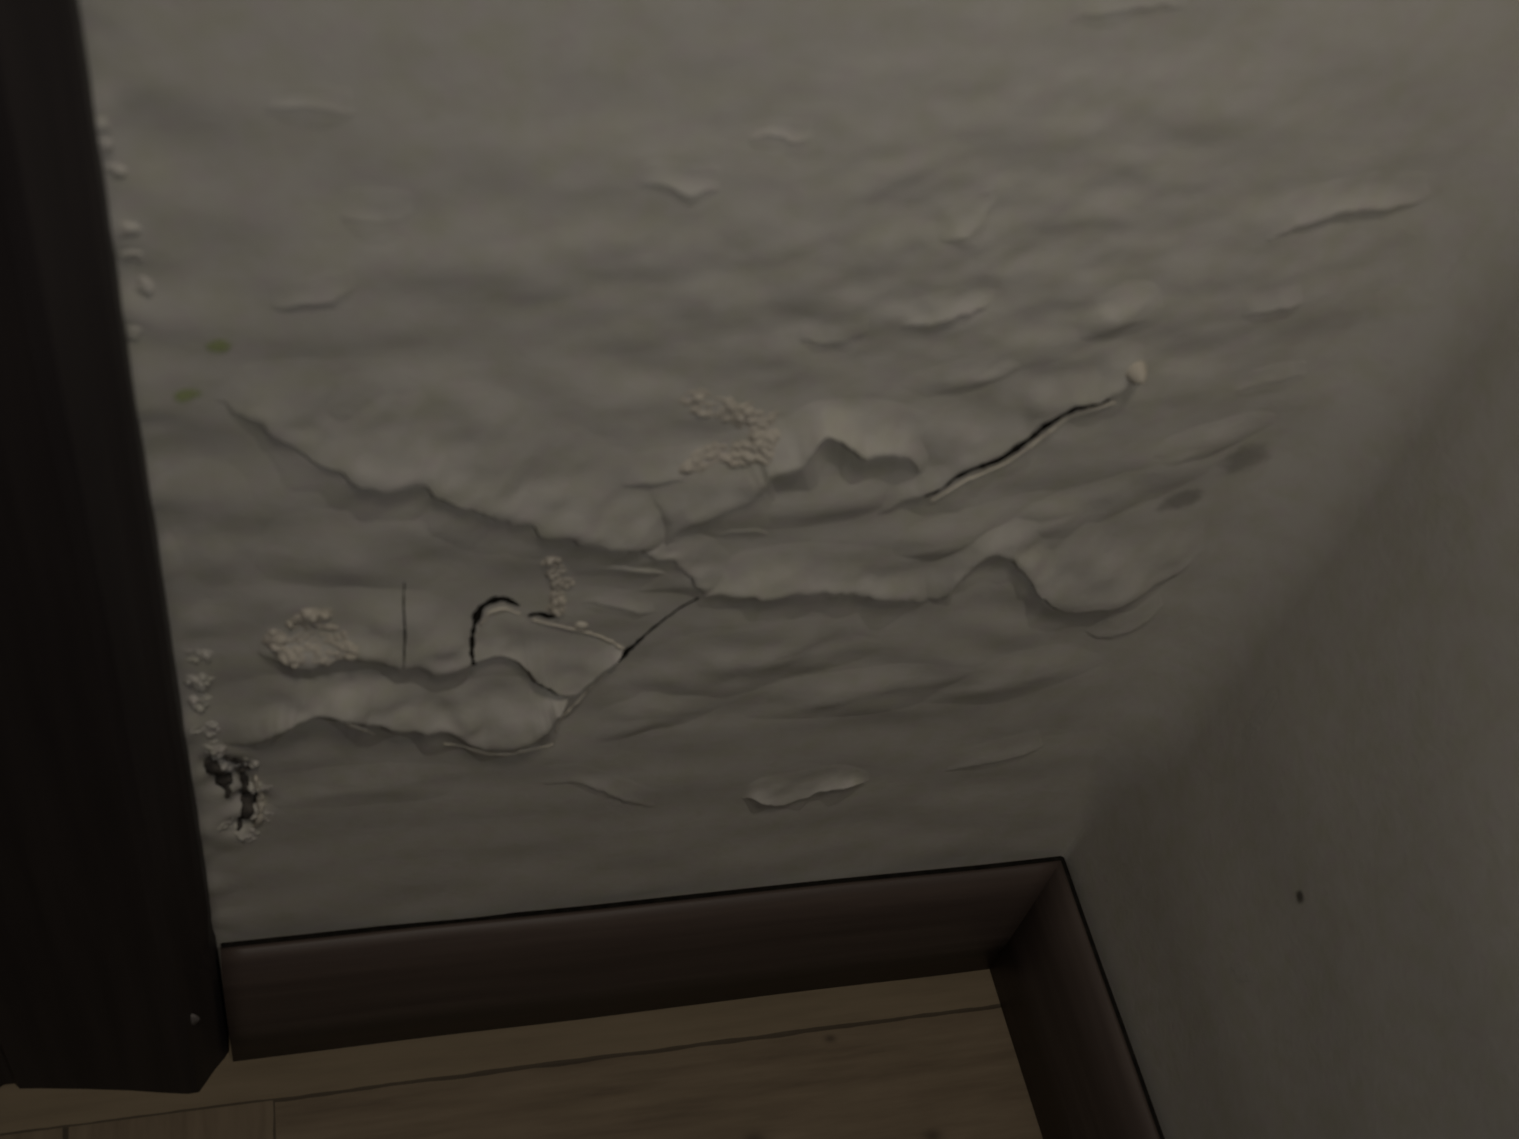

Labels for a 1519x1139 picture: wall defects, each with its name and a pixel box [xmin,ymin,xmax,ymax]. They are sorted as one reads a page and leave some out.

crack [925,399,1115,502]
crack [469,596,557,666]
crack [555,597,699,734]
peeling [183,340,1204,843]